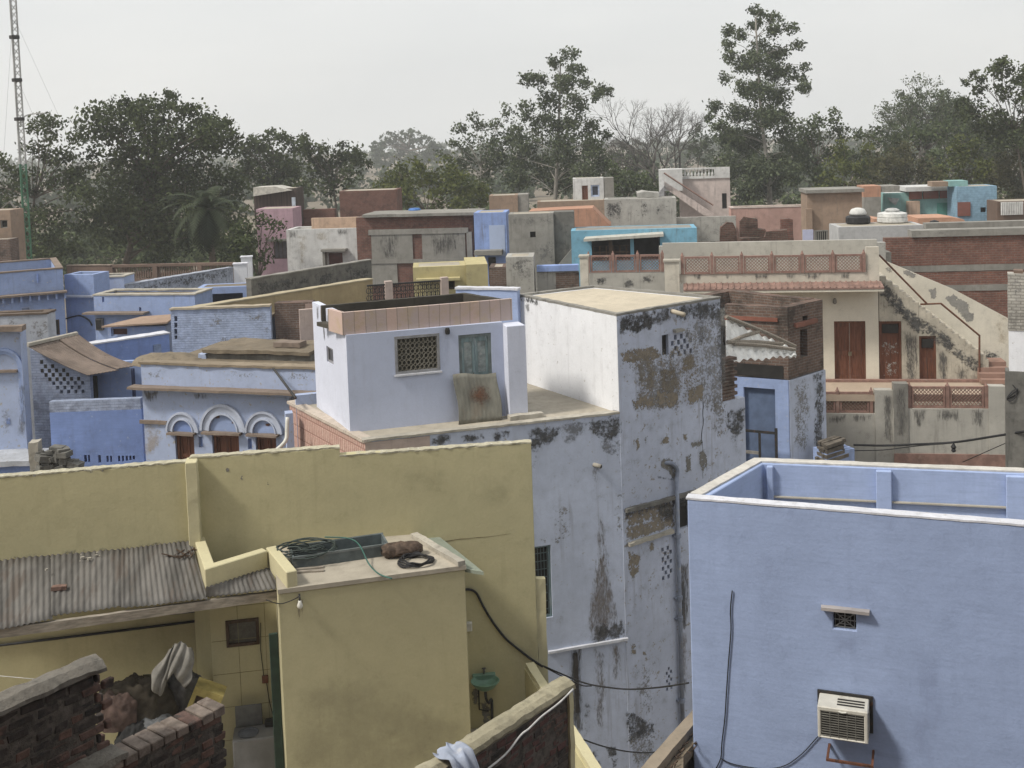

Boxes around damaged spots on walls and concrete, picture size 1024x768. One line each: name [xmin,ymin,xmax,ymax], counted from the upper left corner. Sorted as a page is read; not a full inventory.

peeling [620,313,725,436]
water stain [880,283,999,379]
water stain [529,416,621,453]
peeling [618,495,688,577]
water stain [589,522,624,677]
water stain [627,672,655,764]